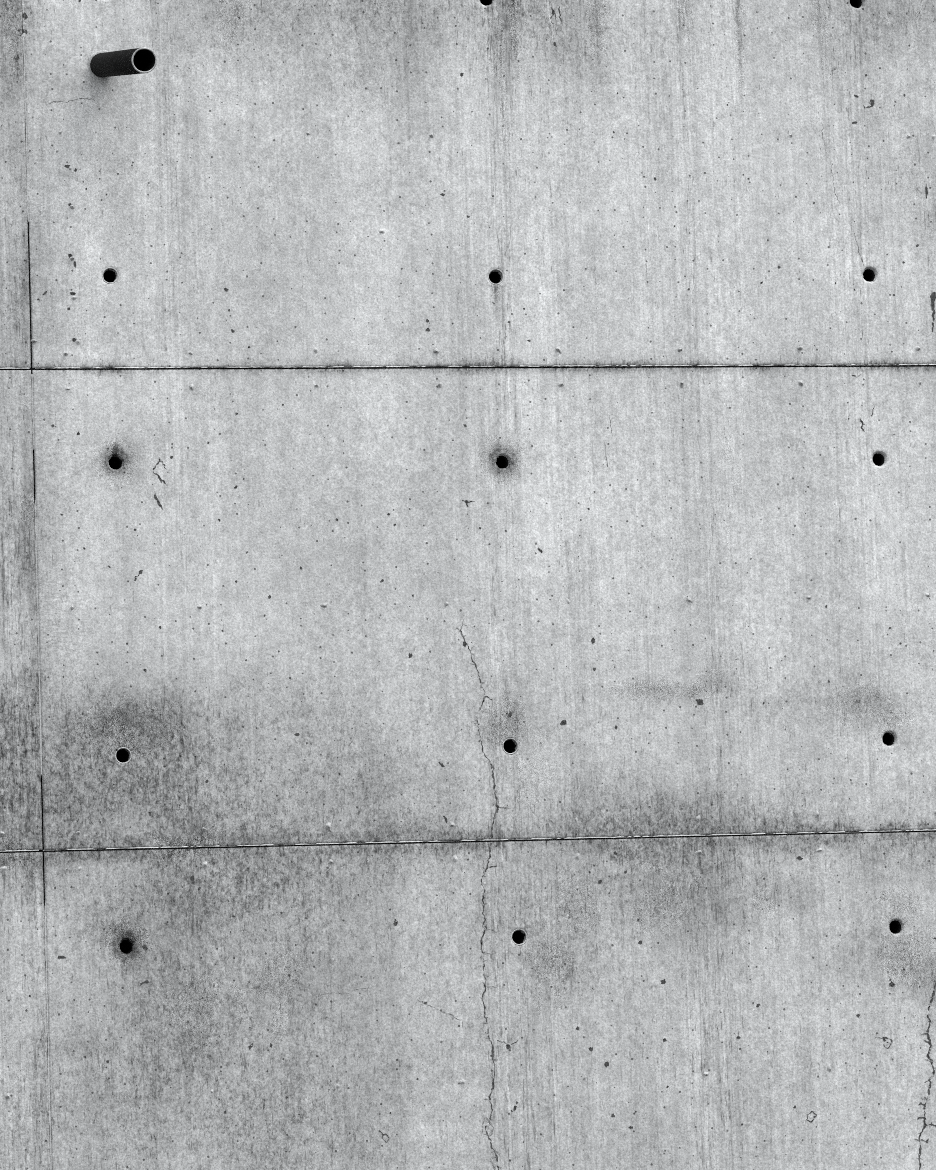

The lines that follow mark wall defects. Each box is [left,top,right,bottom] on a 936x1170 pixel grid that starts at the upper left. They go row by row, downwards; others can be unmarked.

crack [417,620,509,1170]
crack [915,982,936,1170]